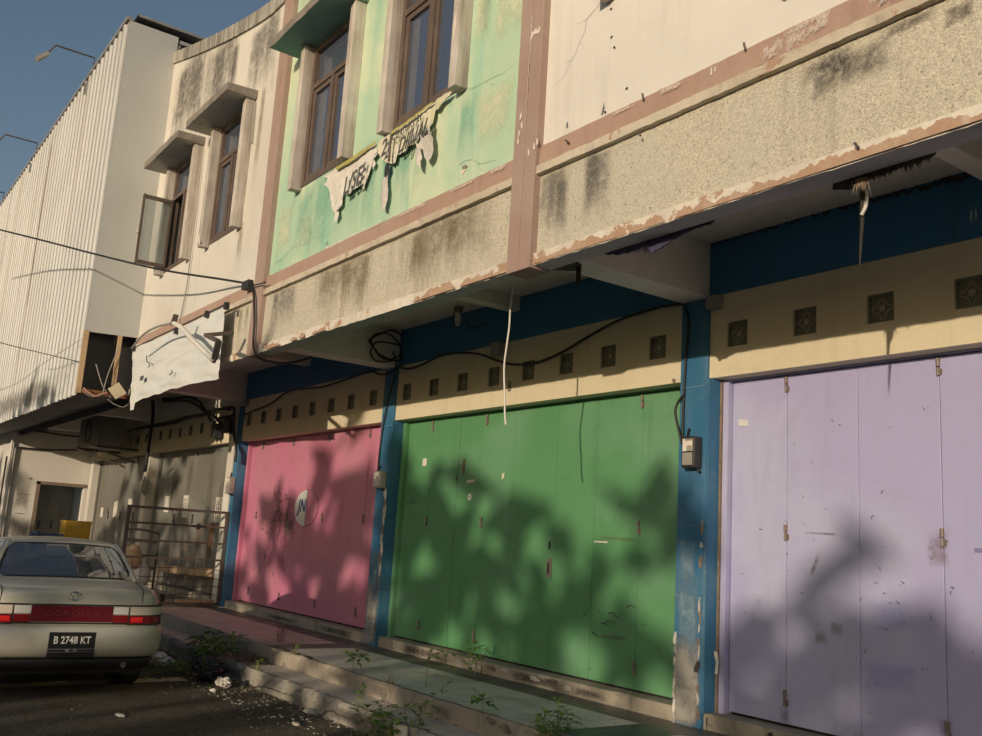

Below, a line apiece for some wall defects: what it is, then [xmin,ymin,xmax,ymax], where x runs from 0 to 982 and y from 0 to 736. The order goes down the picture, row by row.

water stain [176,55,201,118]
water stain [213,40,237,92]
water stain [252,21,272,73]
peeling [763,8,830,58]
peeling [532,113,982,287]
peeling [413,268,507,302]
peeling [364,488,387,643]
peeling [672,520,705,724]